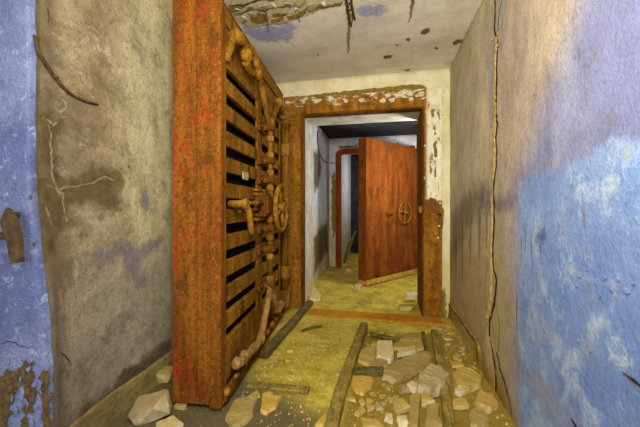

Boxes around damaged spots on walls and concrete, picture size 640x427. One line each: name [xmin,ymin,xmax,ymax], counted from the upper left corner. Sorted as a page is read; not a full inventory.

spalling [224,0,345,30]
peeling [283,84,426,107]
peeling [424,125,444,240]
crack [448,0,512,415]
peeling [0,360,54,427]